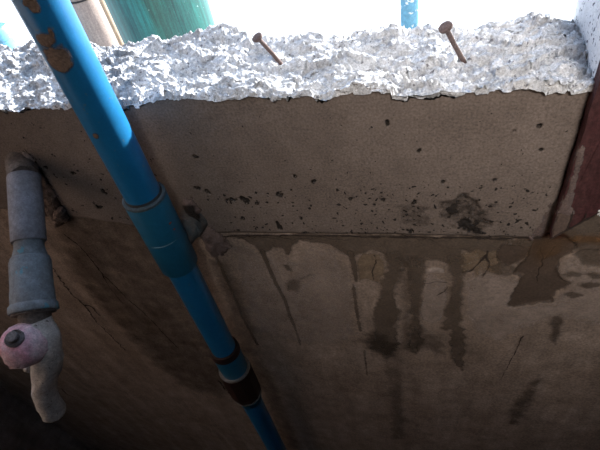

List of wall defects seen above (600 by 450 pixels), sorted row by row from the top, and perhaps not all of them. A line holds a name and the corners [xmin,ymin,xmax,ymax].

spalling [0,39,72,113]
spalling [90,10,595,109]
damp [230,234,510,370]
flaking render [462,203,600,306]